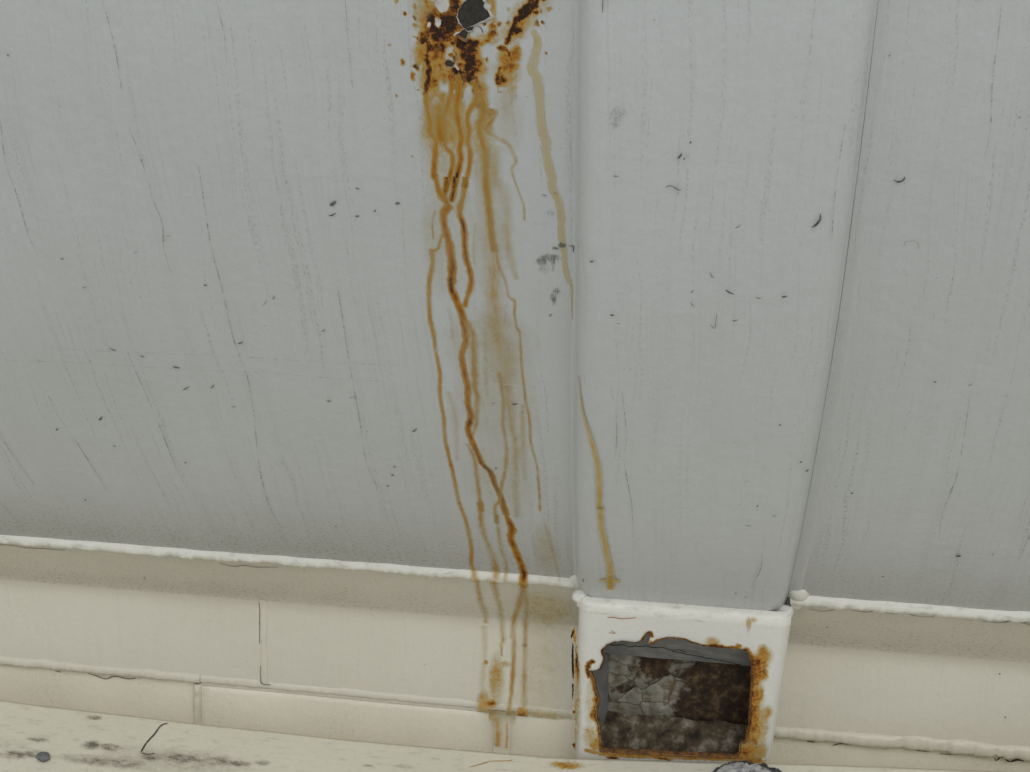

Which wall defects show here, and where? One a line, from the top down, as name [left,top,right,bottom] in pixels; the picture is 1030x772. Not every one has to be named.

peeling [427,0,494,42]
rust [395,0,573,761]
rust [578,376,620,590]
rust [584,631,772,763]